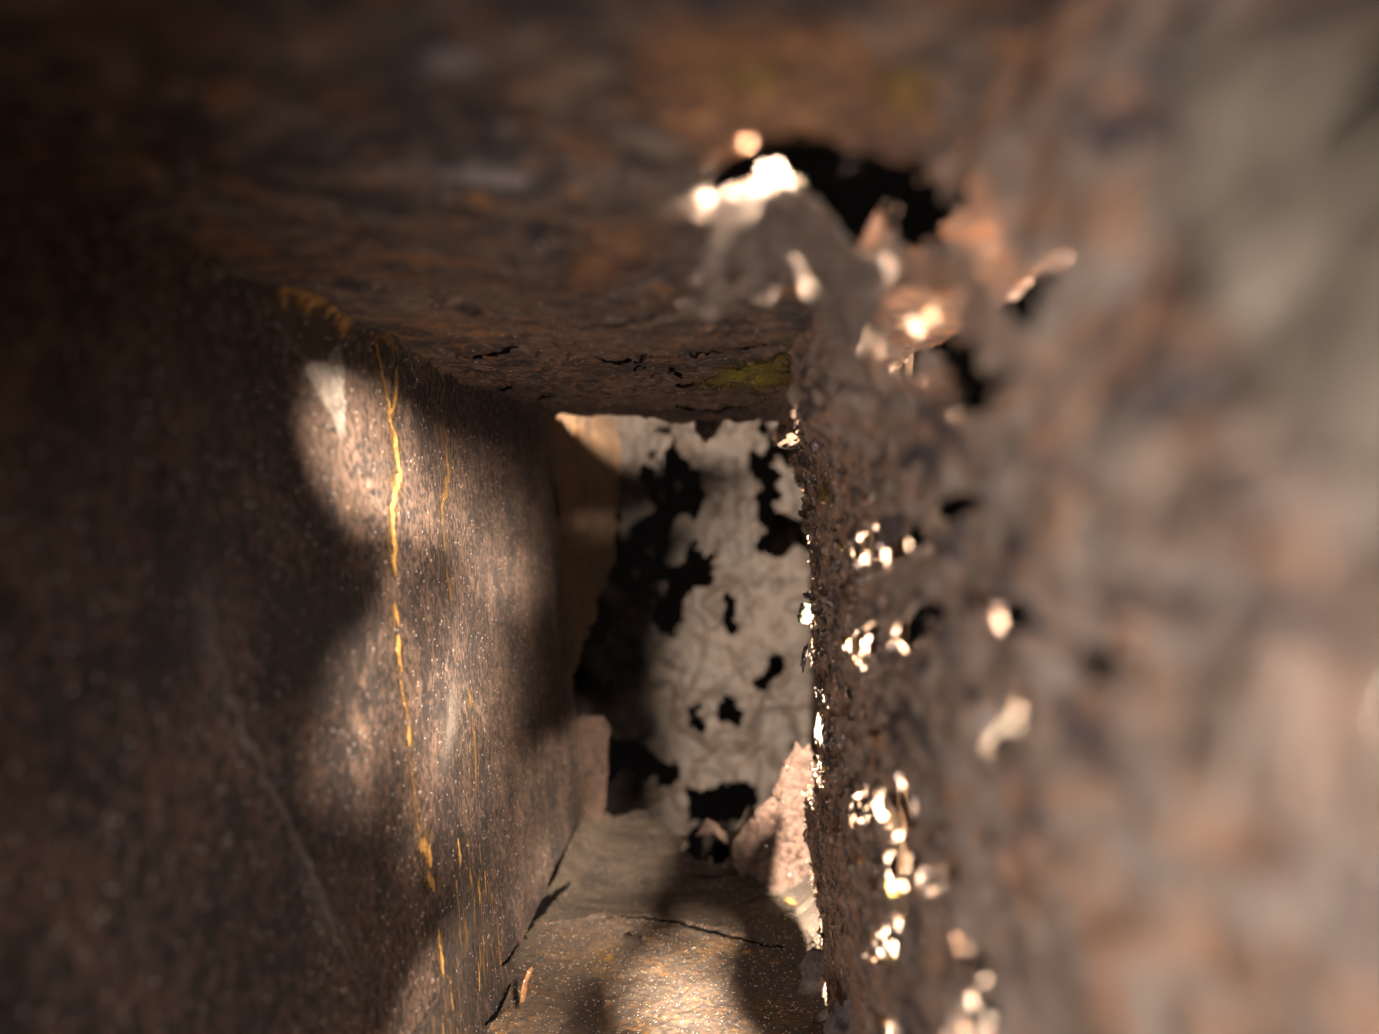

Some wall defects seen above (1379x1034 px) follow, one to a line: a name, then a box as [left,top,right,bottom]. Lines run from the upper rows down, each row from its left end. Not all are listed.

rust [277,286,353,340]
crack [463,346,552,400]
crack [581,312,776,413]
rust [374,341,404,576]
rust [390,599,436,895]